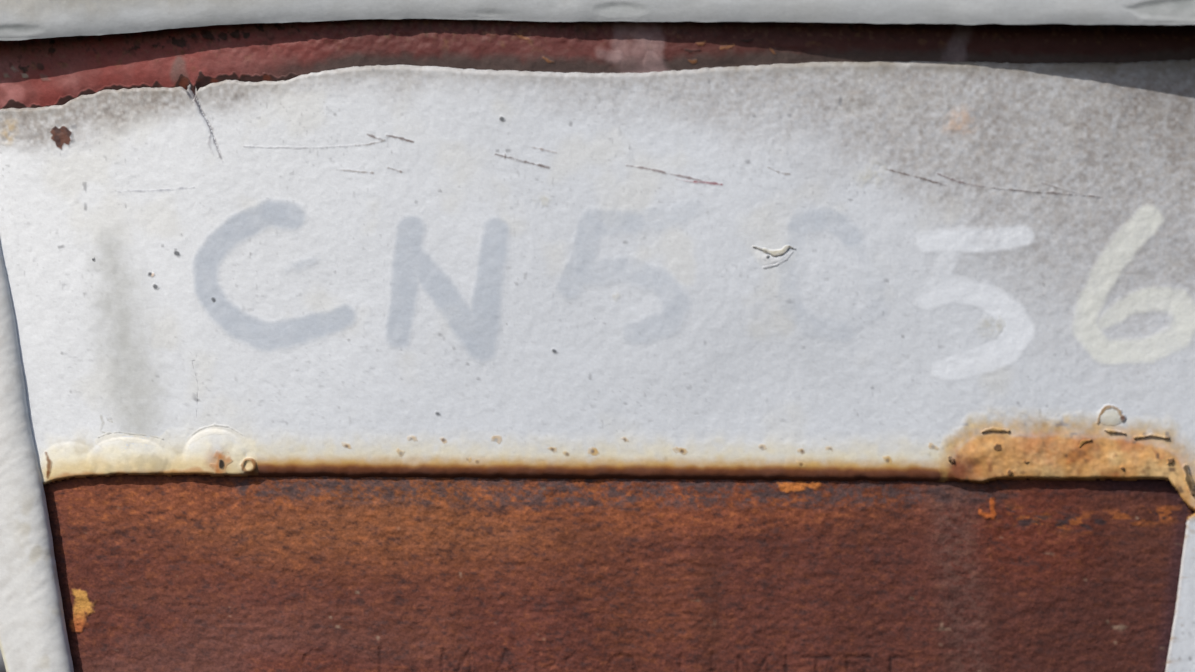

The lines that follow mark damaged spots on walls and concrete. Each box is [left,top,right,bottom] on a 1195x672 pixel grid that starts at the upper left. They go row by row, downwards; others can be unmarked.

crack [187,84,224,164]
corrosion [34,401,1195,525]
corrosion [67,586,97,634]